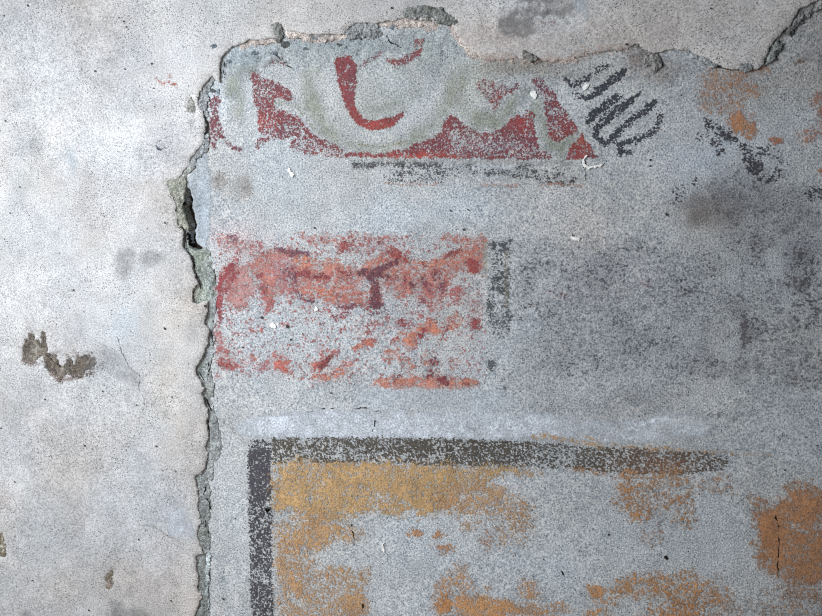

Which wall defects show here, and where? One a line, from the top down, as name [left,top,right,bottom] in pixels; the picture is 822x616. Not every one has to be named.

spalling [239,38,278,50]
spalling [285,31,348,44]
spalling [368,18,631,67]
spalling [186,97,196,113]
spalling [167,153,217,307]
spalling [21,331,105,385]